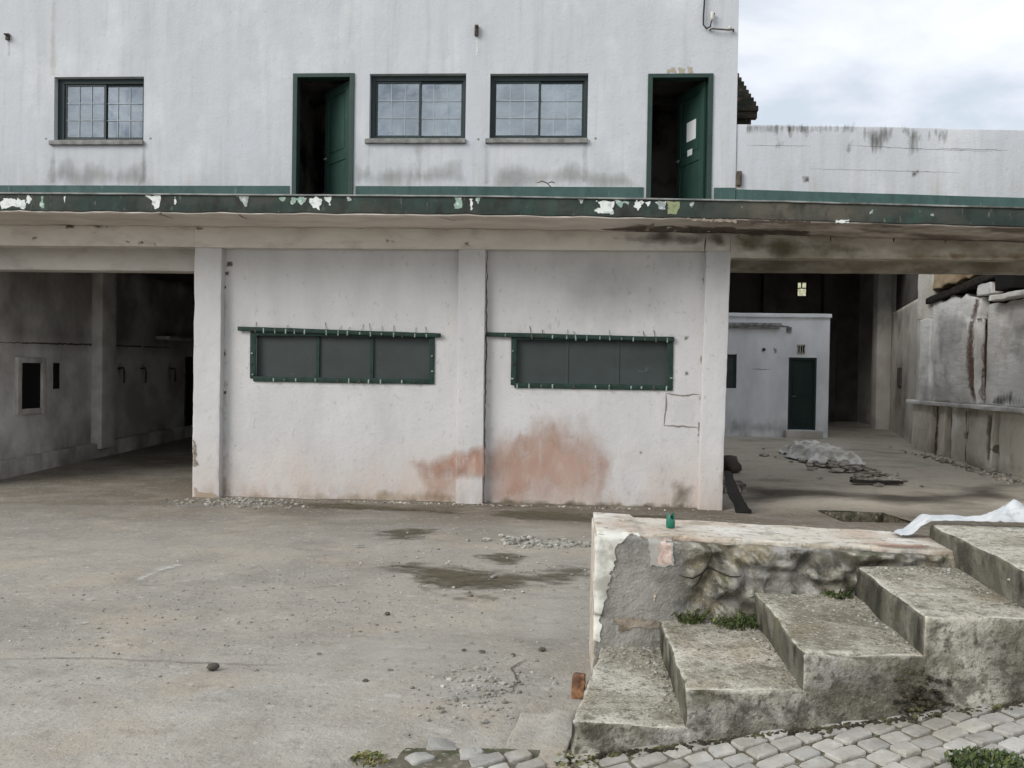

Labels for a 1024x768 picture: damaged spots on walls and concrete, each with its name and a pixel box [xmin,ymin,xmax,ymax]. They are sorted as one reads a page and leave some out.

peeling [0,195,44,209]
peeling [145,195,161,209]
peeling [279,196,331,210]
peeling [594,200,740,239]
leakage [602,226,808,255]
corrosion [967,296,987,399]
leakage [392,553,582,599]
crack [679,549,755,598]